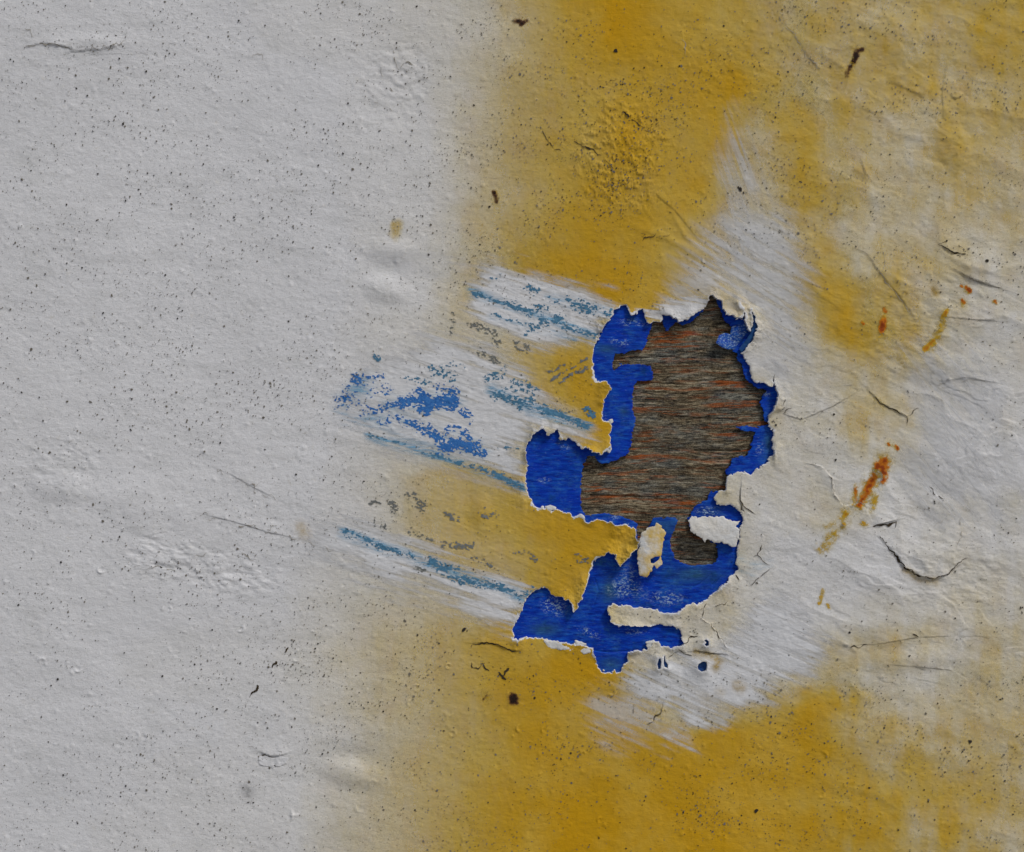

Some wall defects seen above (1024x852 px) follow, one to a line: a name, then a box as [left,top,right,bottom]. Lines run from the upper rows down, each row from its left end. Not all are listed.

rust [878,307,887,338]
rust [922,308,949,352]
crack [783,385,918,425]
peeling [512,296,778,673]
rust [818,442,899,554]
crack [814,464,965,579]